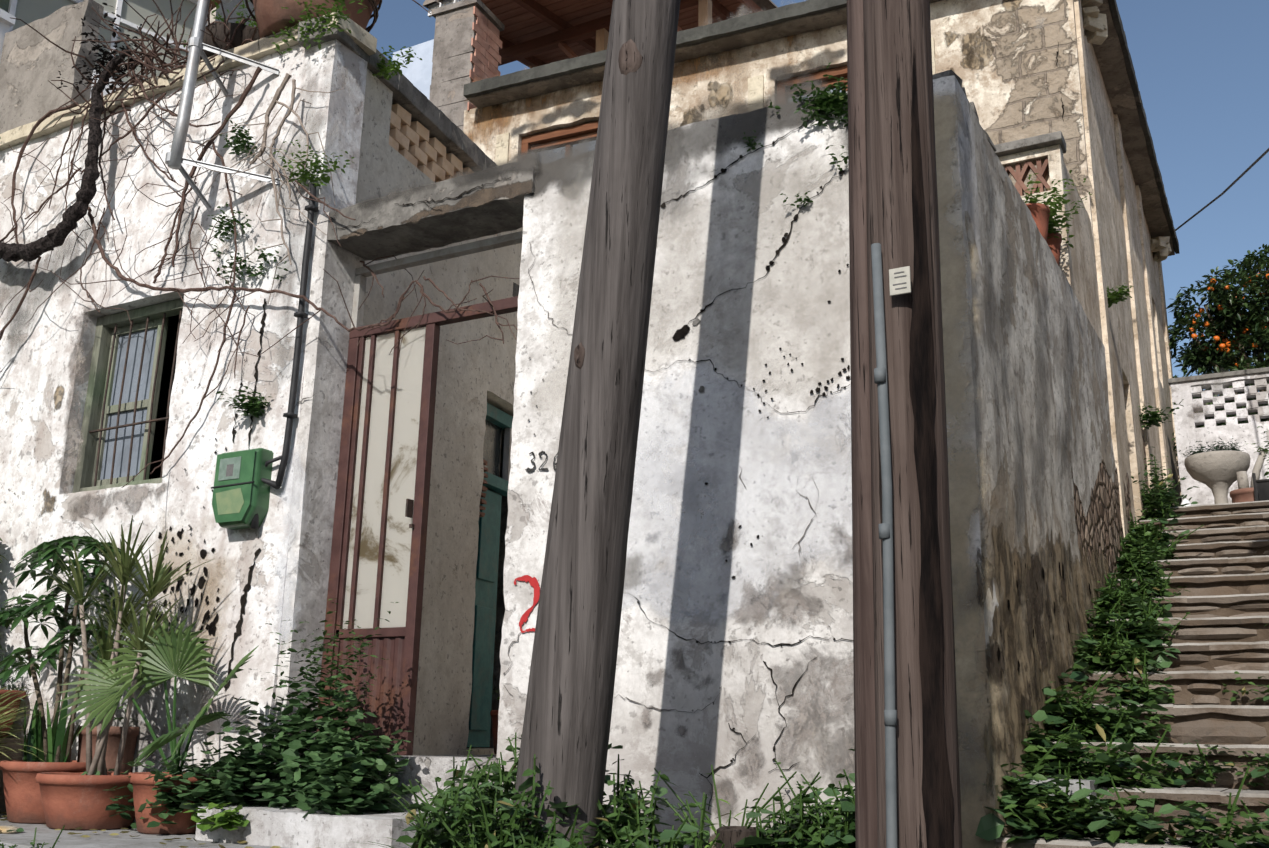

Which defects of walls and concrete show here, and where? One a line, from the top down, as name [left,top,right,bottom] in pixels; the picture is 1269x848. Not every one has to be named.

crack [660,112,821,208]
peeling [945,0,1094,196]
crack [689,168,848,322]
crack [647,359,850,413]
crack [223,548,261,691]
crack [614,592,853,810]
peeling [976,522,1110,799]